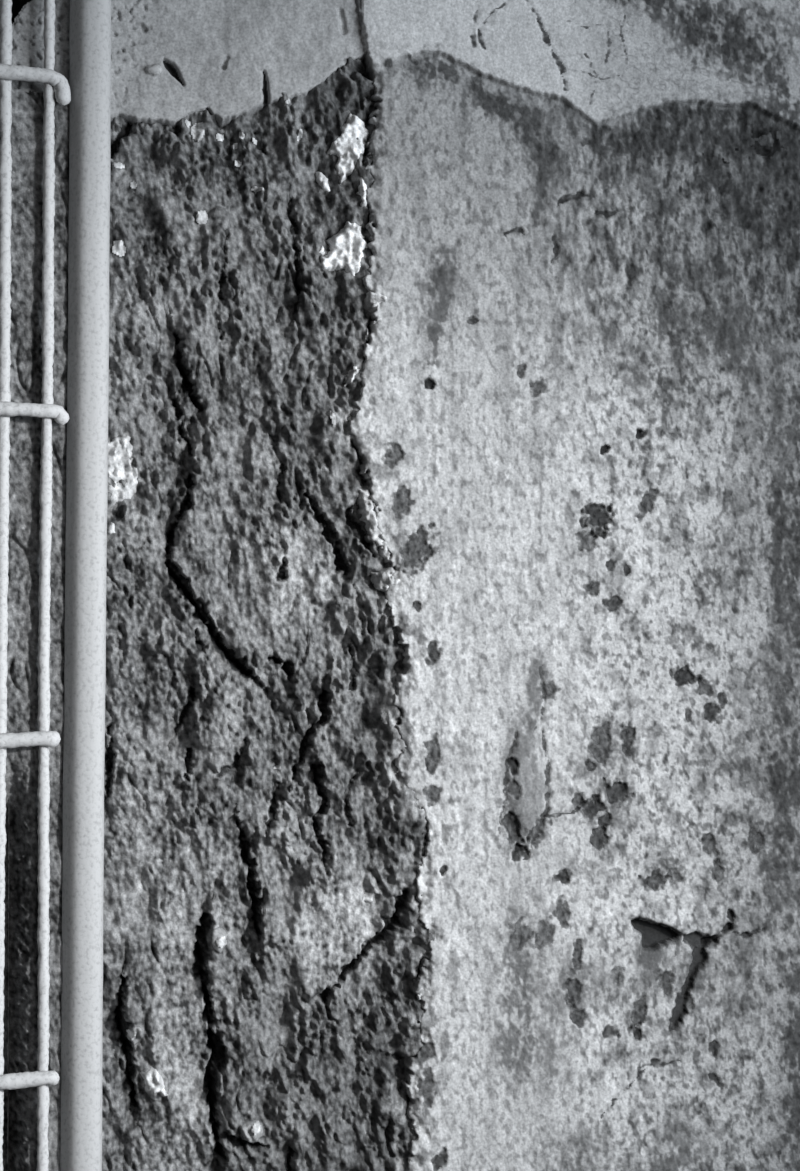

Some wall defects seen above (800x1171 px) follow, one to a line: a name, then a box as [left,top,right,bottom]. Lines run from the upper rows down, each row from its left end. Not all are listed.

crack [470,0,628,103]
damp [408,55,560,226]
damp [580,0,800,248]
damp [423,246,456,365]
damp [660,287,747,358]
spalling [0,87,69,1171]
spalling [102,57,441,1171]
spalling [509,869,571,950]
spalling [563,939,586,1028]
spalling [602,993,647,1040]
spalling [631,919,678,995]
spalling [432,1147,448,1170]